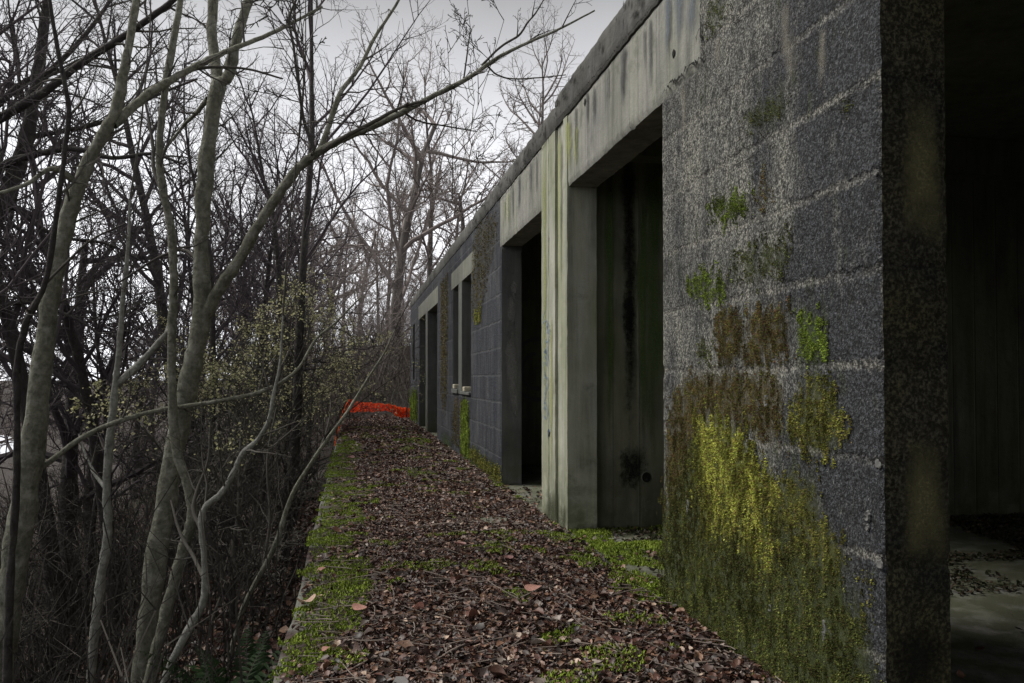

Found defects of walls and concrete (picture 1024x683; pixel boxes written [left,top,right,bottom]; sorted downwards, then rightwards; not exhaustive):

leakage [558,90,595,240]
leakage [605,165,662,403]